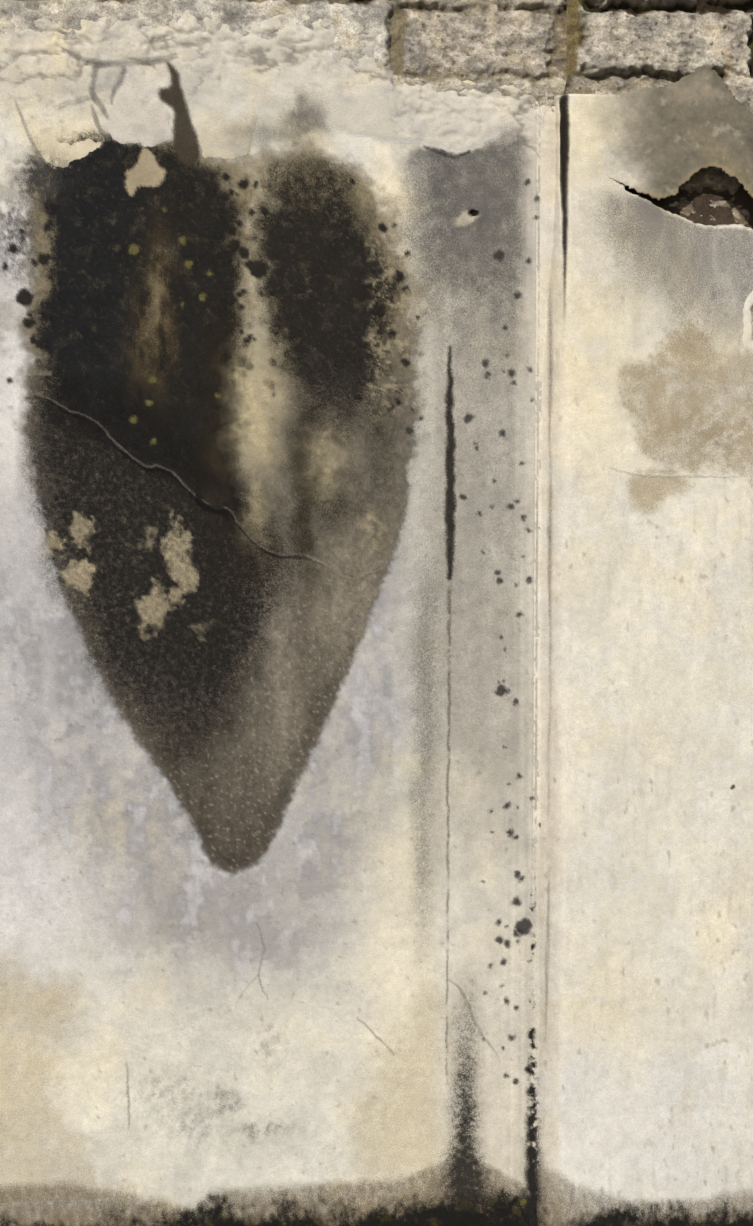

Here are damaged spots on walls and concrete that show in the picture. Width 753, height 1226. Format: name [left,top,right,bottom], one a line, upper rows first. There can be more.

spalling [0,0,753,169]
peeling [457,209,479,225]
leakage [603,198,753,324]
spalling [669,167,750,225]
crack [27,397,372,578]
leakage [0,62,539,873]
leakage [622,328,753,510]
mould [489,898,536,966]
leakage [0,977,753,1226]